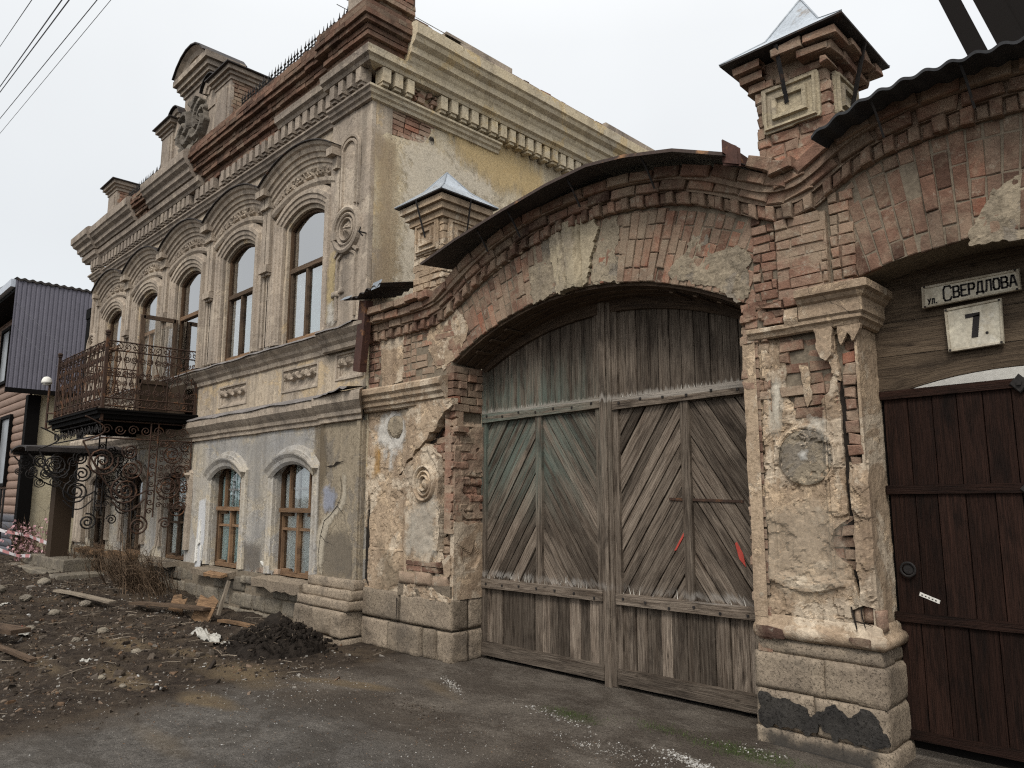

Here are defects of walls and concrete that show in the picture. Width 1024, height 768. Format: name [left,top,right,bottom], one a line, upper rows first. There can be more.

peeling [392,111,495,203]
peeling [395,214,415,297]
spalling [514,248,534,305]
spalling [617,208,687,284]
spalling [758,297,864,464]
crack [318,461,343,570]
spalling [433,411,469,522]
crack [839,373,873,632]
spalling [432,534,462,594]